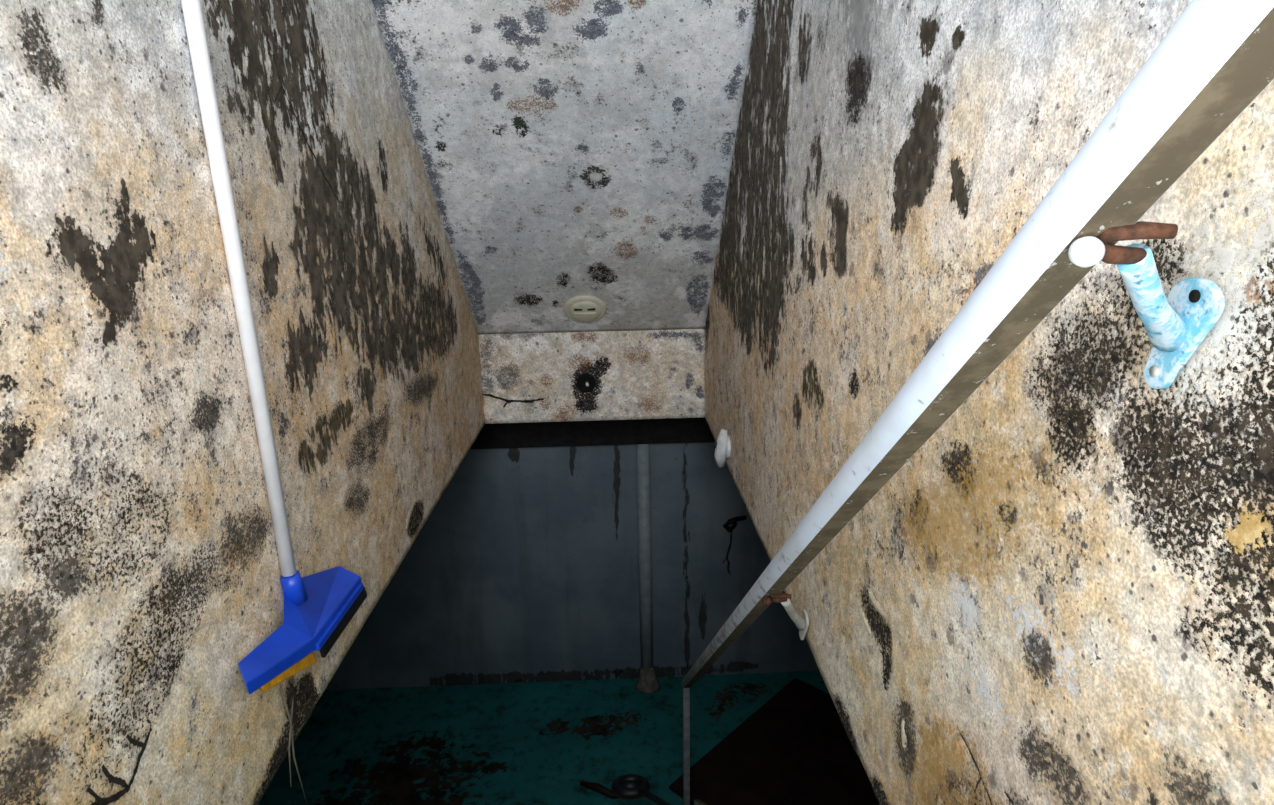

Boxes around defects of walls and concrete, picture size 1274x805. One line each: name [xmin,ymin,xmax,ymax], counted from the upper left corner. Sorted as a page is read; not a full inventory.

leakage [572,0,624,40]
leakage [372,0,559,394]
leakage [575,143,611,189]
leakage [657,175,727,314]
leakage [0,374,19,393]
leakage [0,416,40,481]
leakage [298,399,391,518]
leakage [900,239,1274,709]
leakage [0,464,272,805]
crack [87,728,152,805]
leakage [966,658,1089,805]
leakage [1144,746,1230,805]